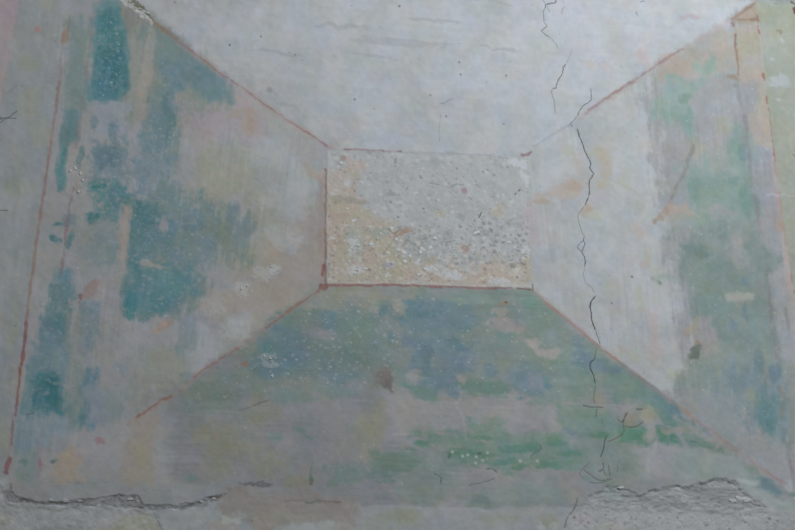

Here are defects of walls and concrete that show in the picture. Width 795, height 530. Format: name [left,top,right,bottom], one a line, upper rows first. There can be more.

flaking render [118,0,155,26]
crack [541,0,644,529]
flaking render [0,478,216,530]